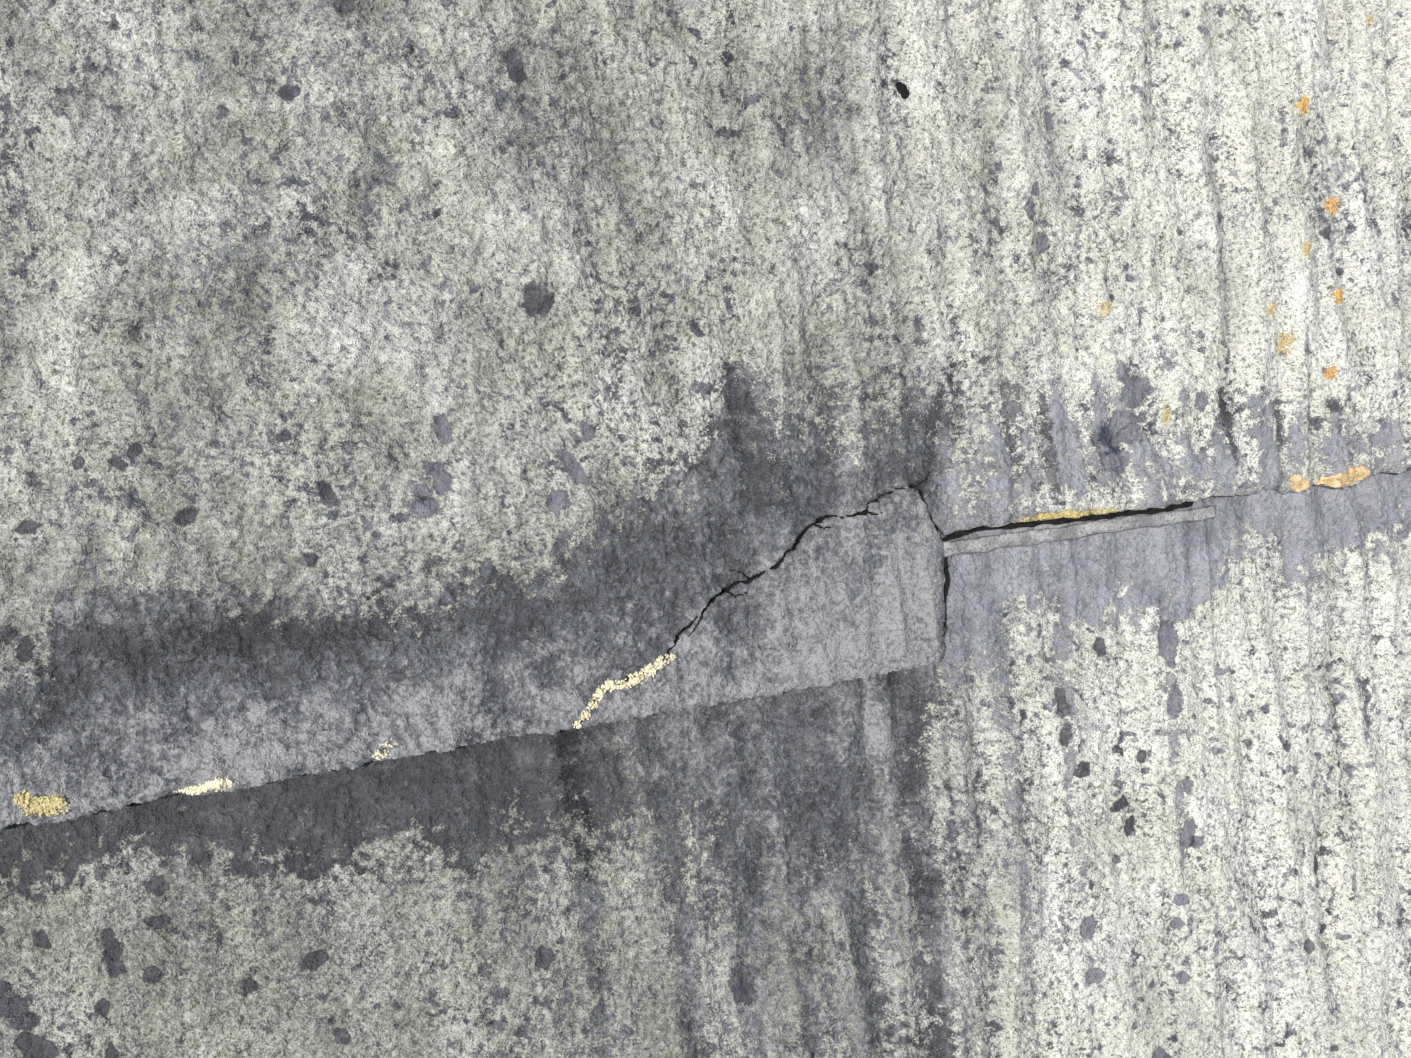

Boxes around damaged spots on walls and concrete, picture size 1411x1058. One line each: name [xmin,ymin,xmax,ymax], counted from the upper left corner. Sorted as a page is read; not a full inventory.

water stain [0,340,1411,1058]
crack [575,468,943,728]
corrosion [1289,465,1371,492]